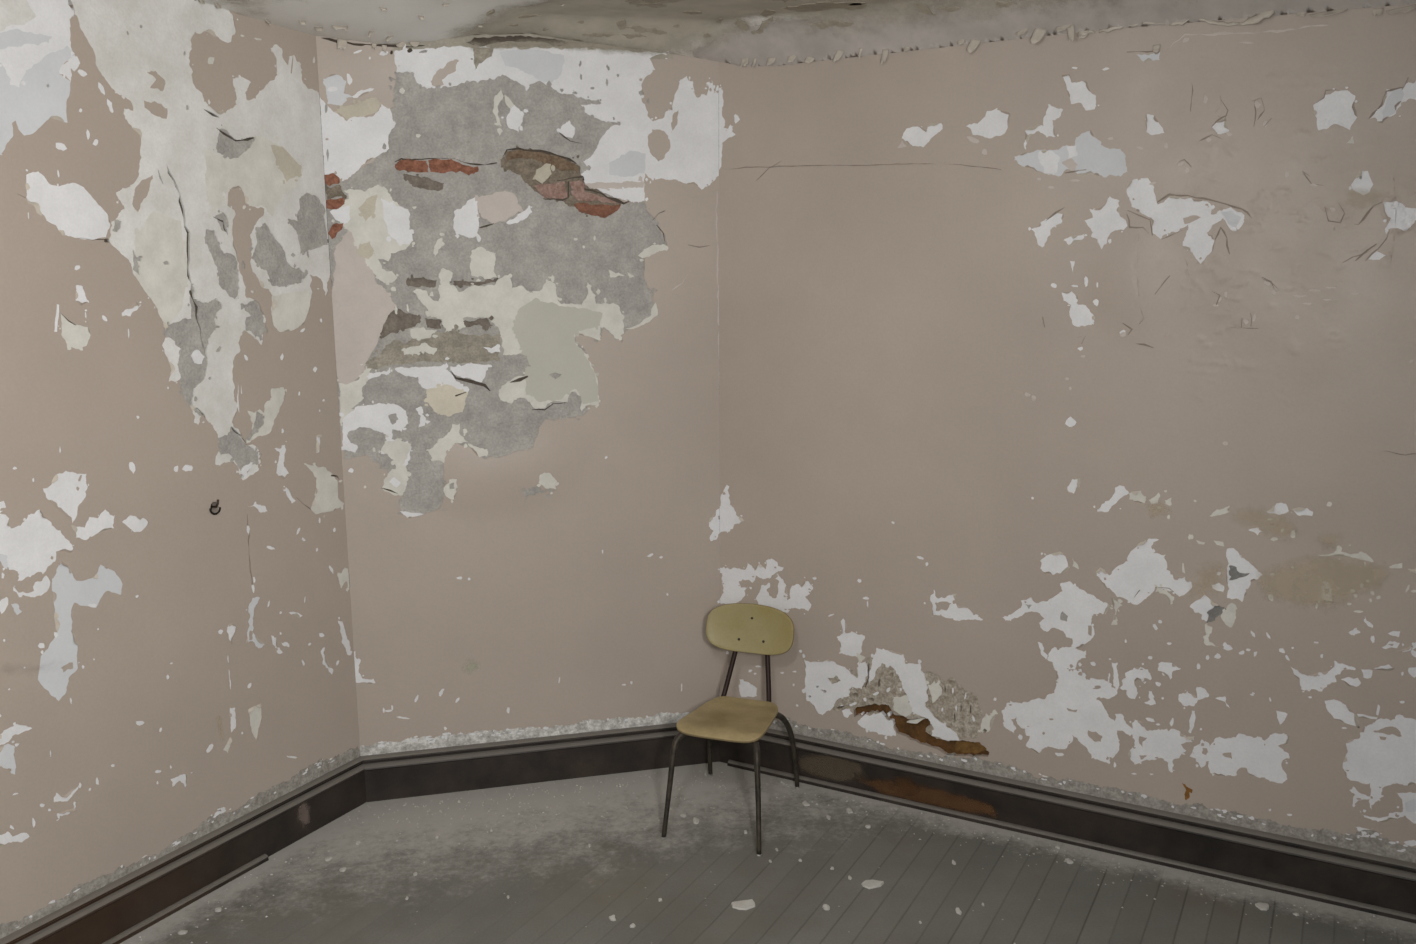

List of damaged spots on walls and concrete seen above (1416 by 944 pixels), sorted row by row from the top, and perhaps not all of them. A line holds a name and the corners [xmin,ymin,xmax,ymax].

crack [737,162,1001,170]
peeling [897,123,943,148]
peeling [967,108,1011,155]
peeling [1313,77,1416,144]
peeling [1014,67,1251,358]
peeling [1324,170,1416,263]
flaking render [0,0,867,532]
peeling [709,485,744,541]
peeling [0,471,149,704]
peeling [717,559,817,614]
peeling [302,617,375,684]
peeling [770,534,1416,863]